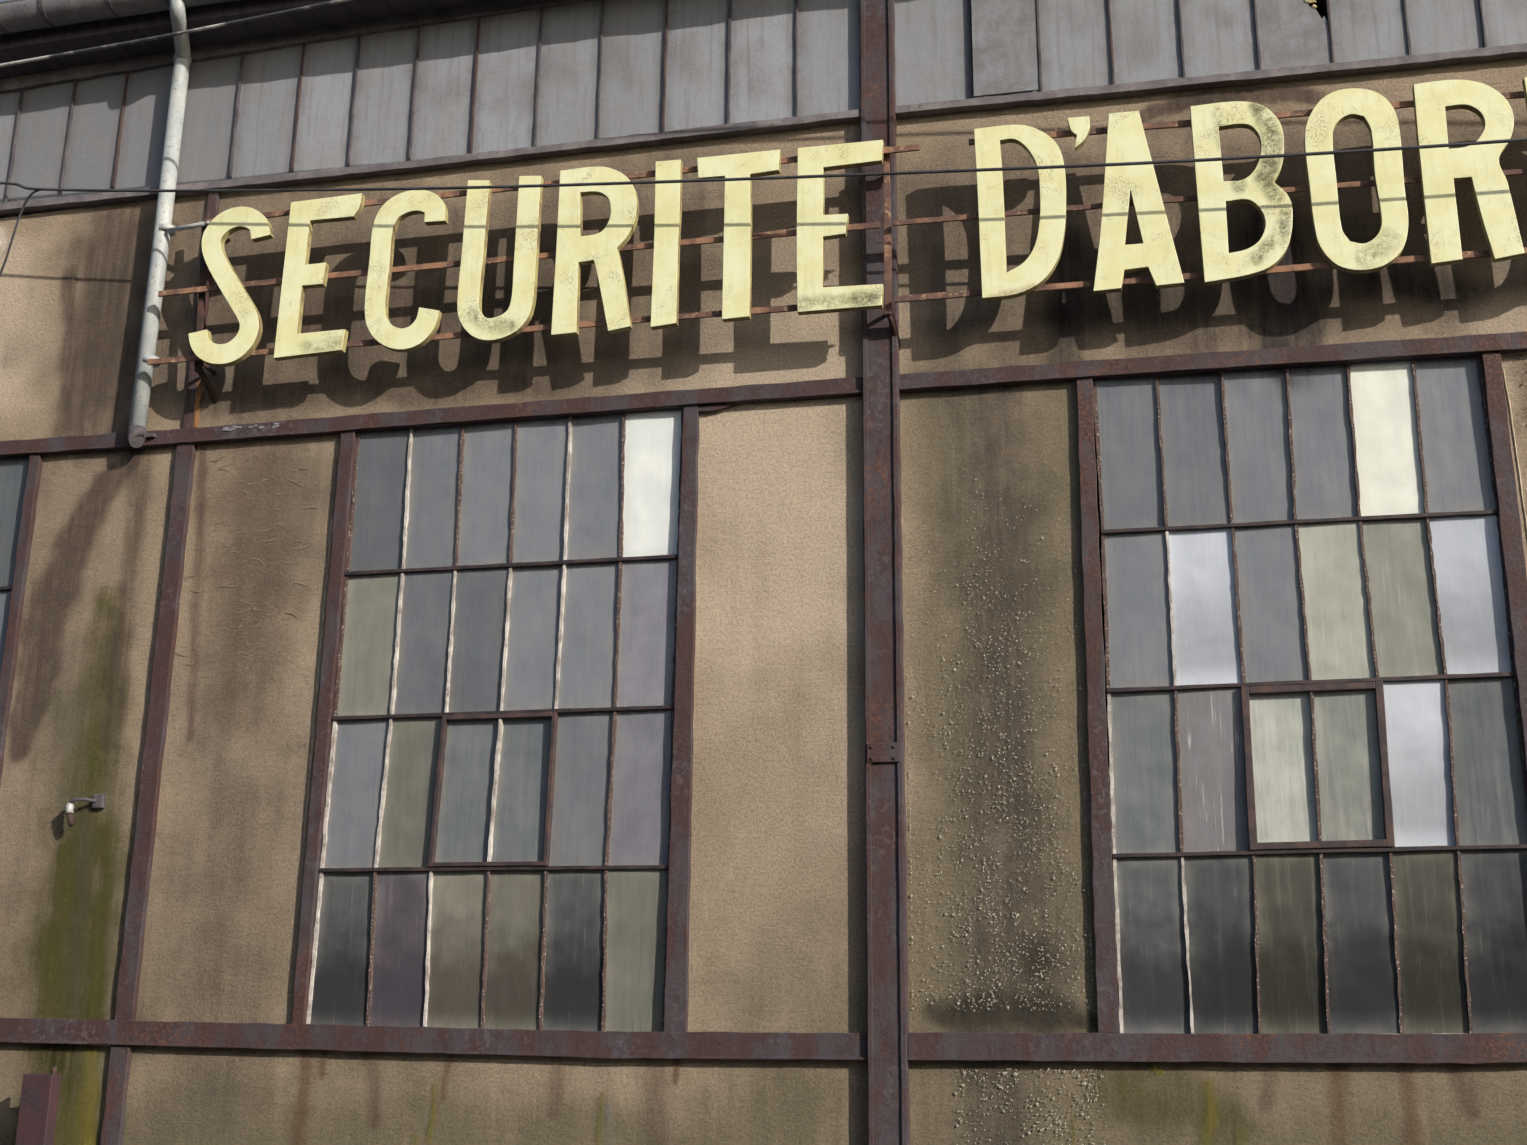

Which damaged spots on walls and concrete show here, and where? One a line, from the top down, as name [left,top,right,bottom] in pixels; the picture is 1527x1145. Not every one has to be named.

water stain [62,205,138,436]
water stain [11,449,141,759]
water stain [907,399,1097,1032]
water stain [954,1068,1107,1145]